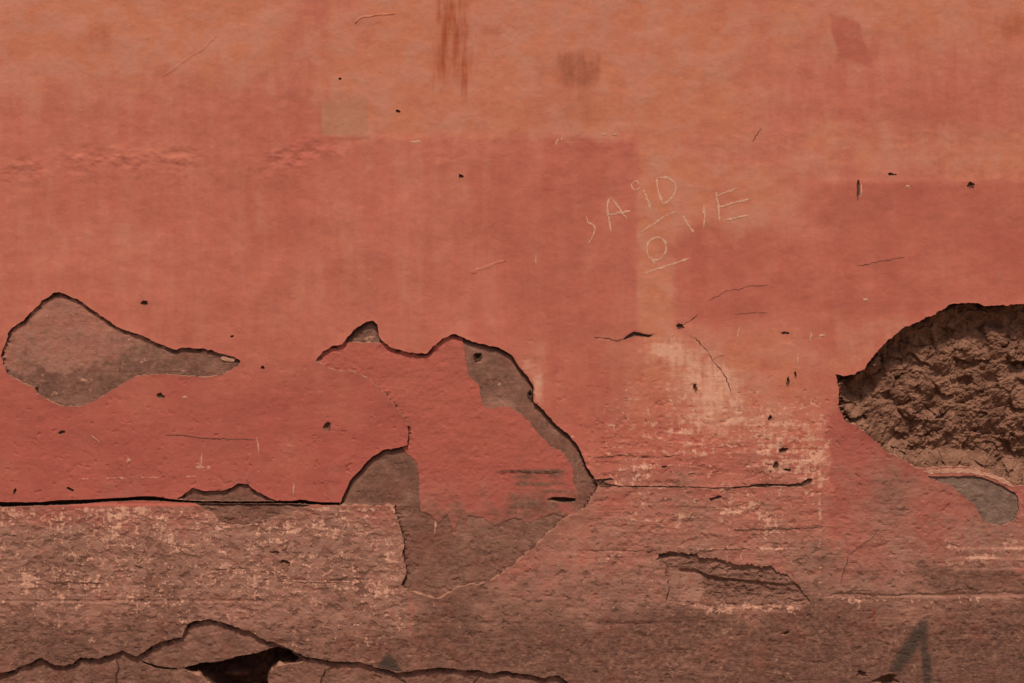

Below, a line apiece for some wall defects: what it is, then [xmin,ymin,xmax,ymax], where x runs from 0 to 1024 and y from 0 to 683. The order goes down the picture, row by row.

peeling [1,292,240,407]
spalling [836,303,1024,526]
crack [0,496,342,507]
peeling [177,483,309,525]
peeling [316,321,598,599]
crack [592,454,813,489]
spalling [655,551,810,610]
peeling [0,619,568,683]